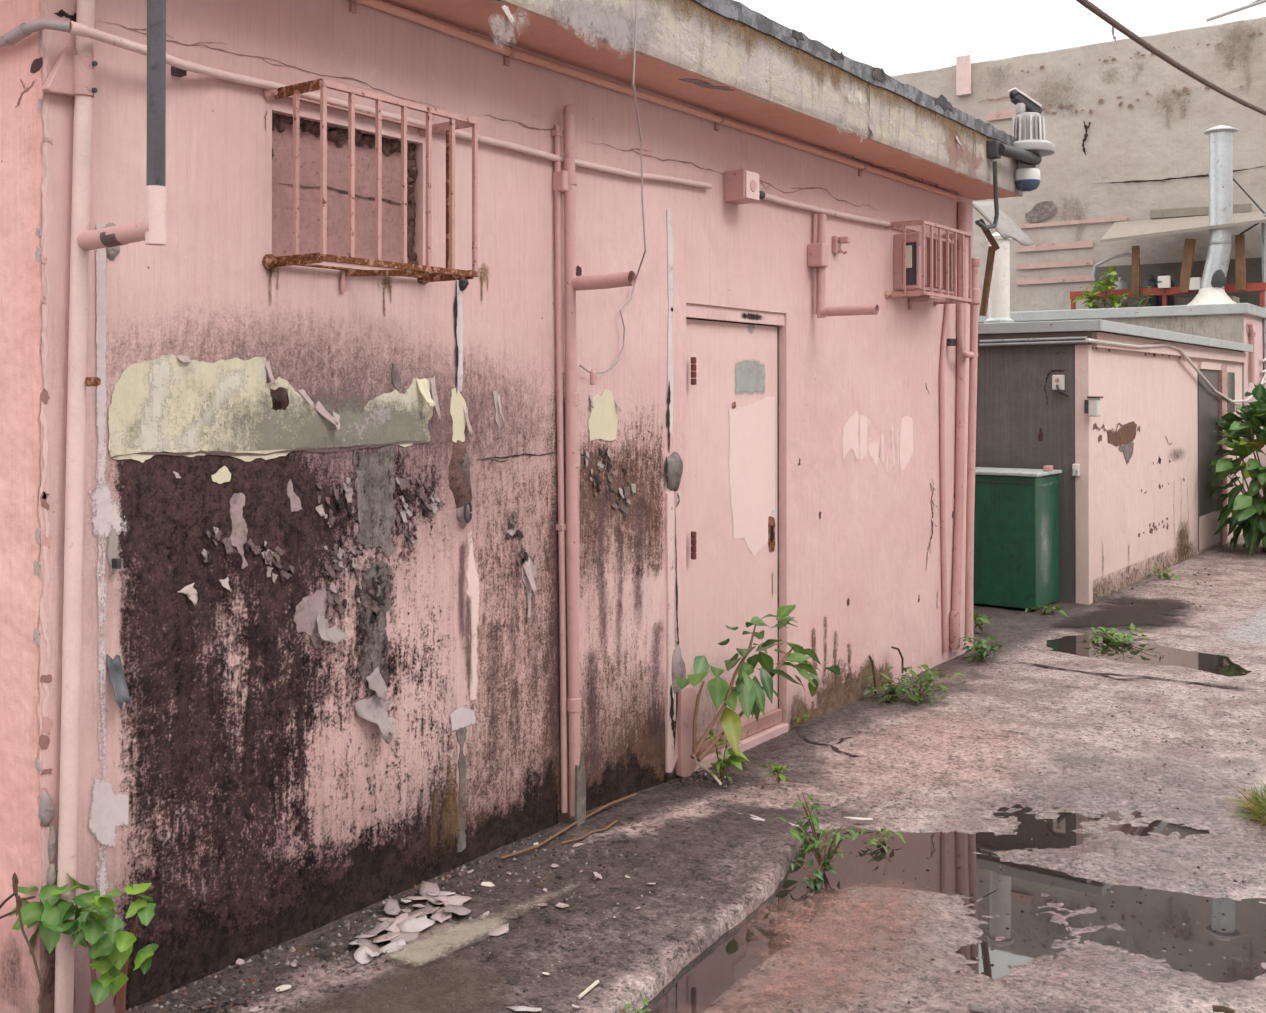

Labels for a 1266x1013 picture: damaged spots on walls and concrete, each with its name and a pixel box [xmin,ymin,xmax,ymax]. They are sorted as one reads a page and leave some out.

peeling [108,354,473,744]
leakage [89,399,679,1010]
peeling [585,389,636,516]
flaking render [1093,421,1140,464]